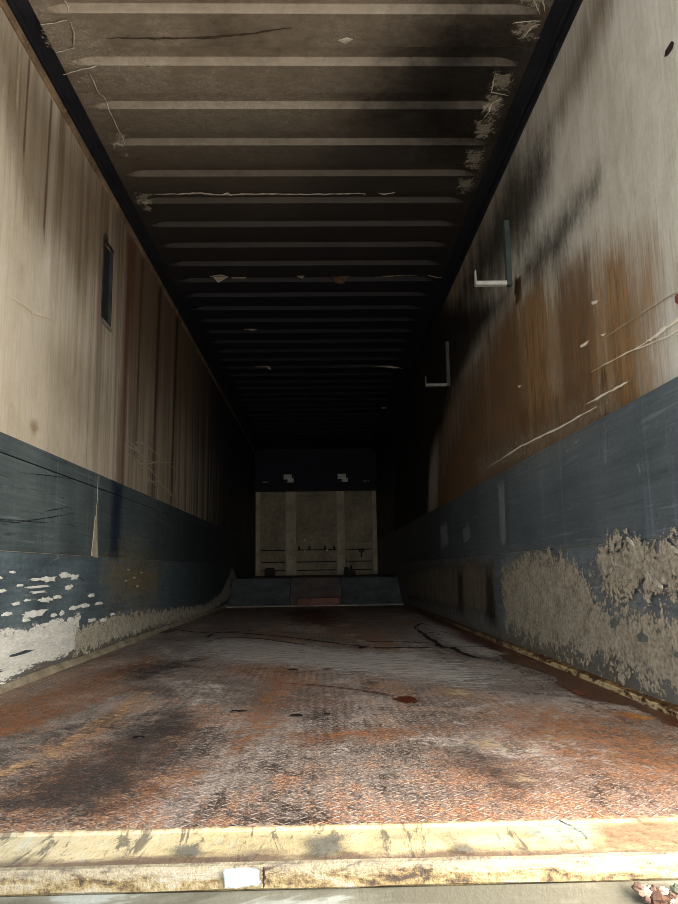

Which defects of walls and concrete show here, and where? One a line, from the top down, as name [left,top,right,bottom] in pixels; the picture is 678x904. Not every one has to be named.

damp [395,149,655,548]
peeling [0,568,236,684]
crack [169,623,492,658]
peeling [404,545,678,701]
corrosion [0,689,152,776]
corrosion [227,658,427,755]
corrosion [405,608,678,790]
corrosion [588,814,678,852]